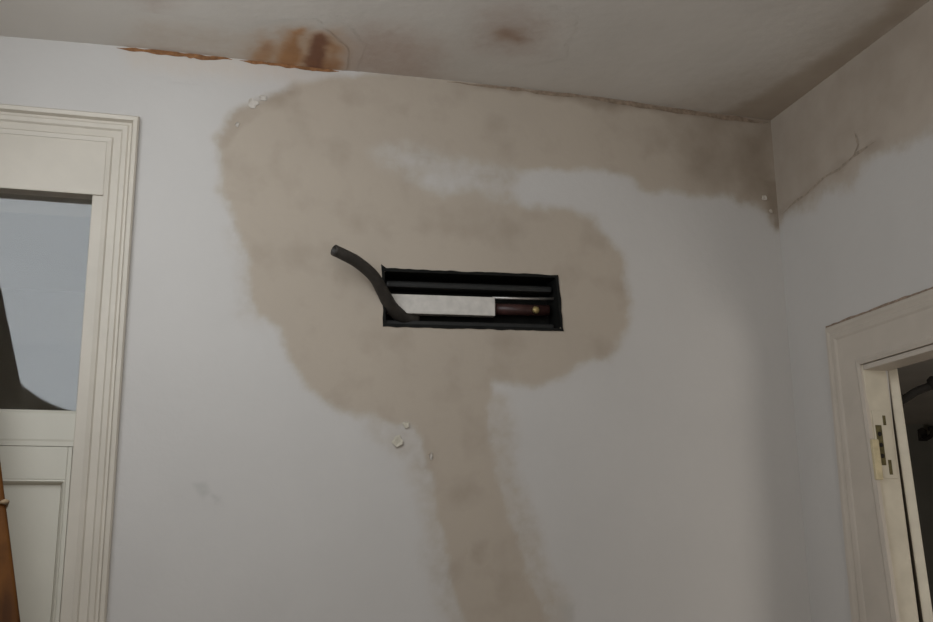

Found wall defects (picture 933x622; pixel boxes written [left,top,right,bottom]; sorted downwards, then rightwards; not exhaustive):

corrosion [103,11,366,92]
damp [205,0,933,622]